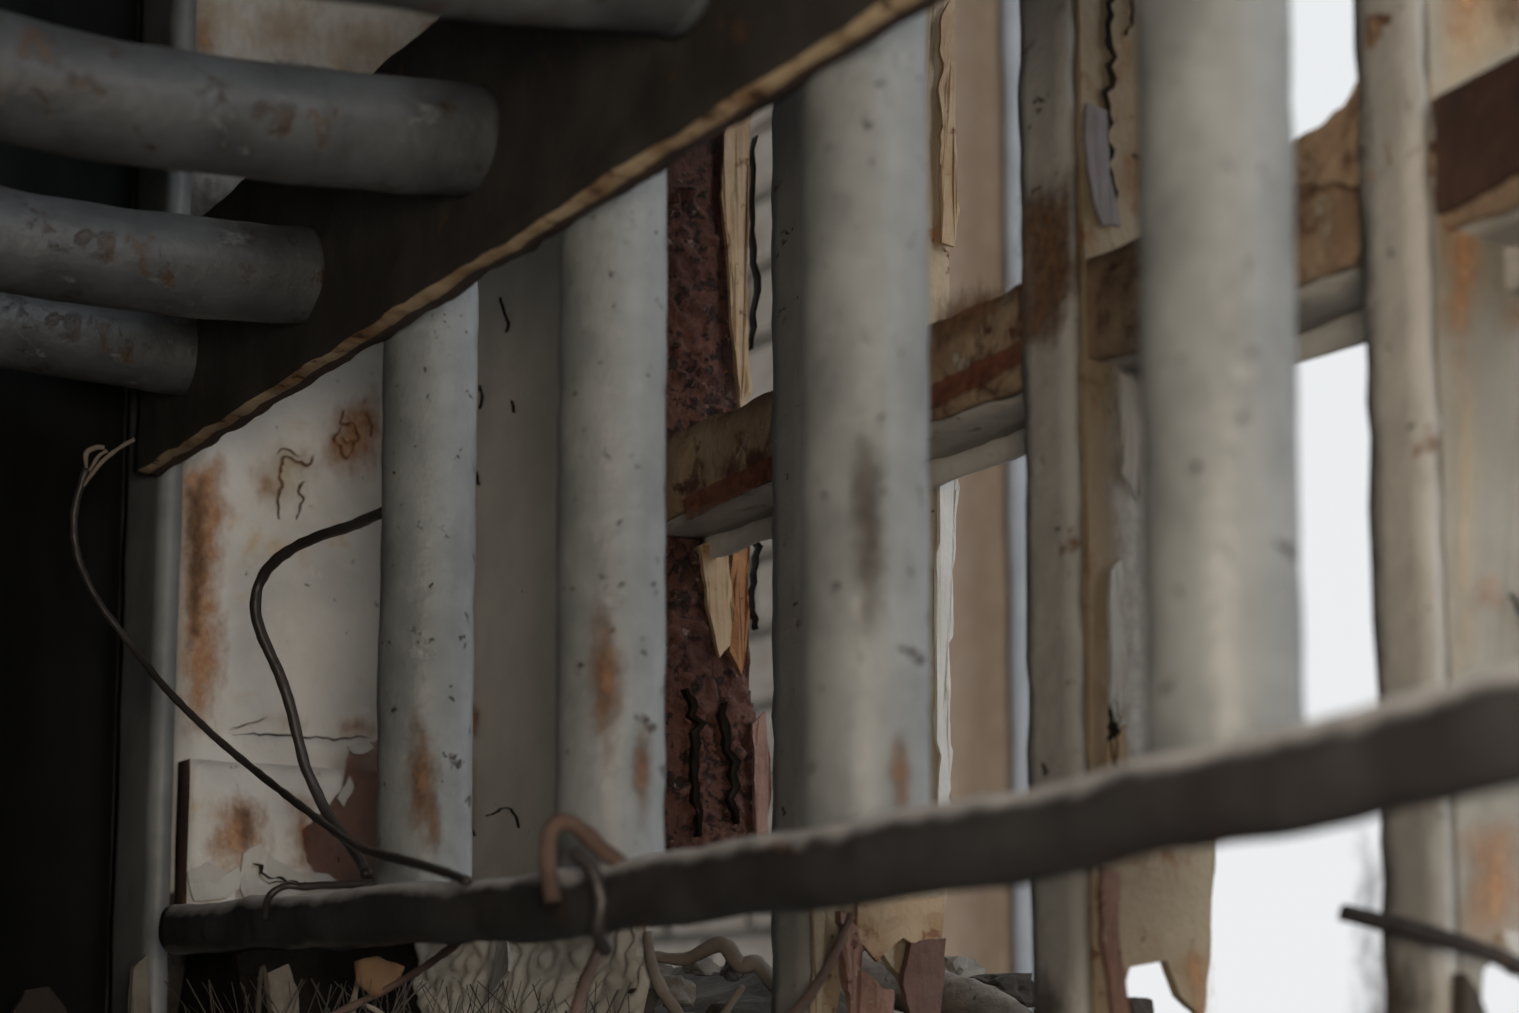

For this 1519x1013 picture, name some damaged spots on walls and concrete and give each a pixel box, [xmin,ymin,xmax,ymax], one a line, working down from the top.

peeling [937,0,960,248]
corrosion [665,178,726,437]
corrosion [186,467,222,714]
crack [276,407,379,520]
corrosion [663,537,756,852]
corrosion [683,456,772,520]
peeling [933,479,960,803]
corrosion [217,803,255,853]